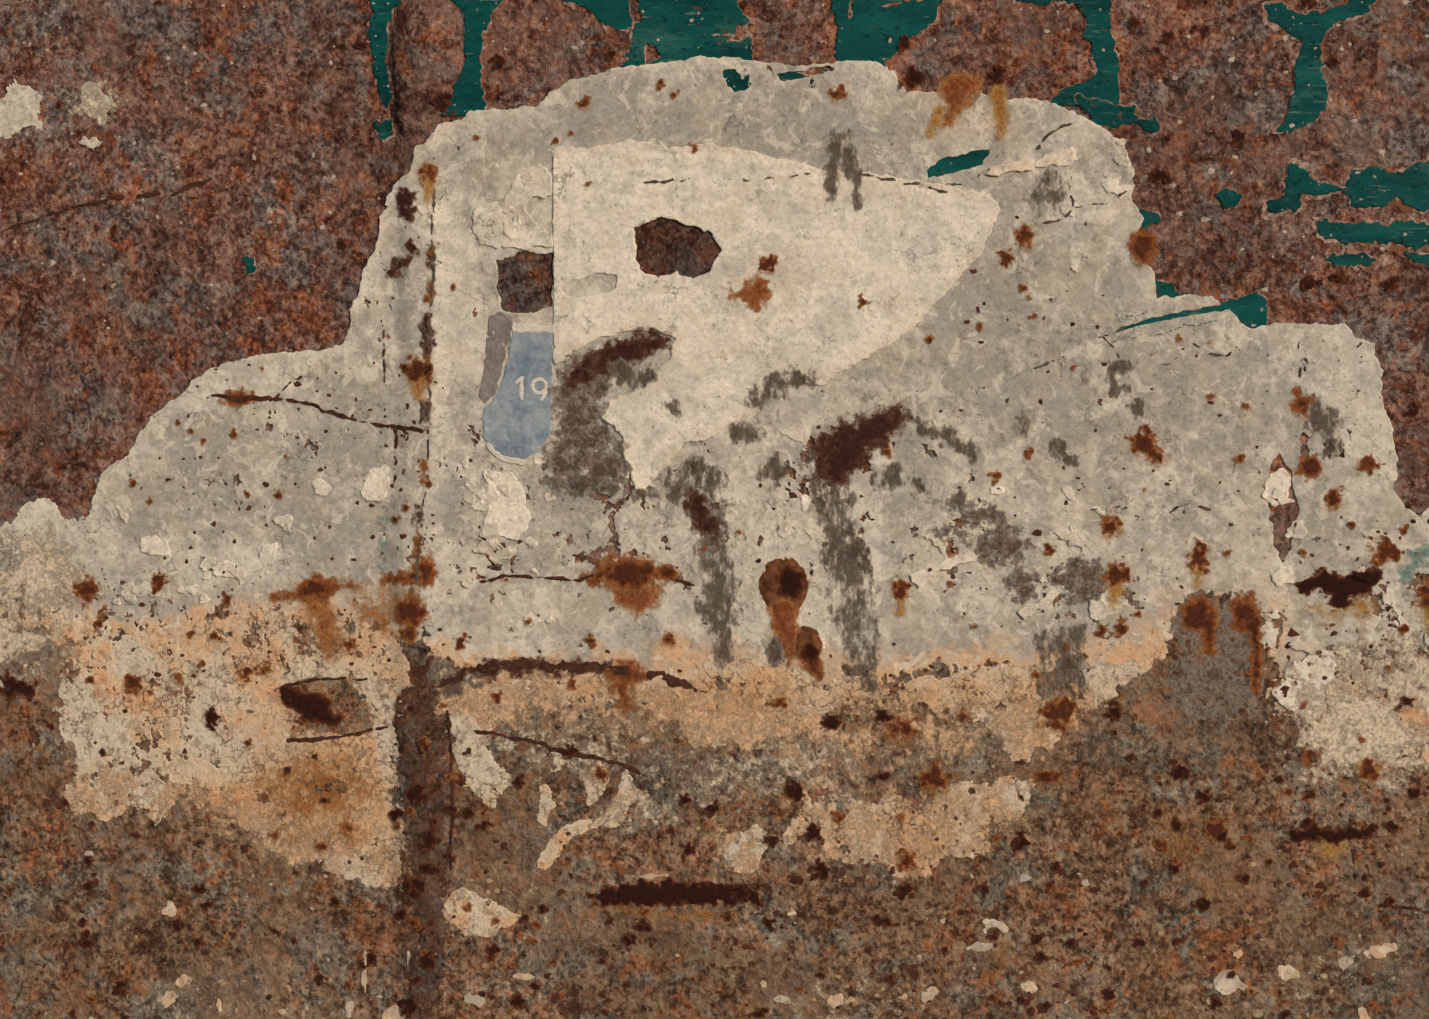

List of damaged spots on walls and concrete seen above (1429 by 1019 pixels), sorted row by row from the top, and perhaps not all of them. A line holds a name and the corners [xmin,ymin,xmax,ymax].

peeling [0,78,63,139]
peeling [354,0,402,143]
corrosion [480,0,636,110]
peeling [1261,0,1379,134]
corrosion [0,0,465,537]
peeling [1261,155,1429,296]
crack [210,157,436,581]
damp [729,365,816,444]
corrosion [1108,0,1429,700]
corrosion [755,557,832,681]
damp [756,403,981,695]
damp [932,487,1108,606]